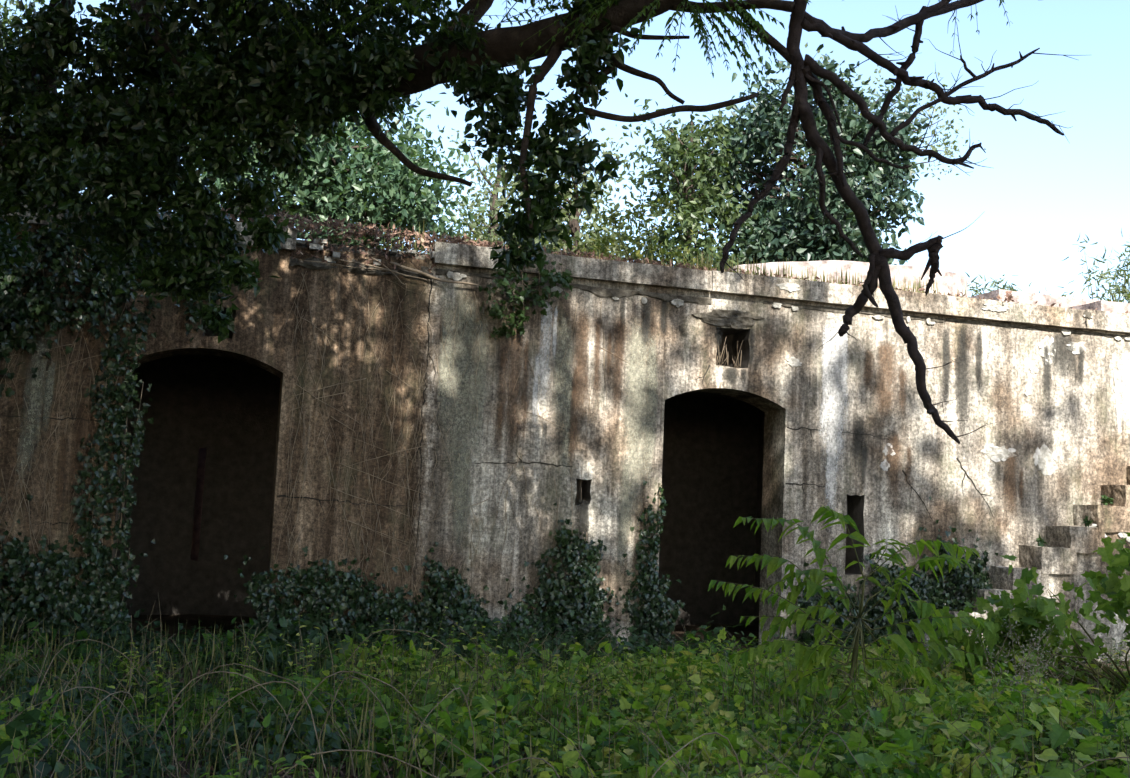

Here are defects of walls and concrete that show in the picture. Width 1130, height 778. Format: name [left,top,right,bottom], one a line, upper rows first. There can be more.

crack [277,279,573,588]
leakage [532,303,572,469]
leakage [618,298,667,560]
leakage [943,328,983,427]
leakage [1043,333,1084,399]